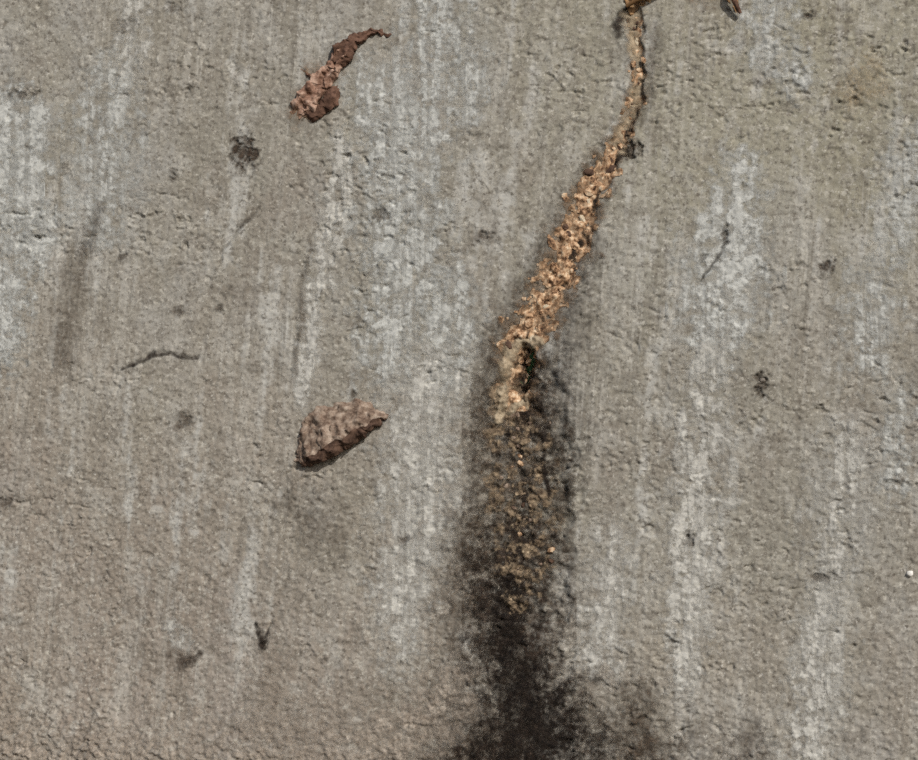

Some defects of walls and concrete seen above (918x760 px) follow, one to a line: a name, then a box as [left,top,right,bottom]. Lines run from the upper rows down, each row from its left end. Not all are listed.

leakage [291,0,635,760]
crack [483,6,647,614]
leakage [653,144,775,700]
leakage [735,0,813,98]
leakage [764,386,918,760]
leakage [836,127,918,385]